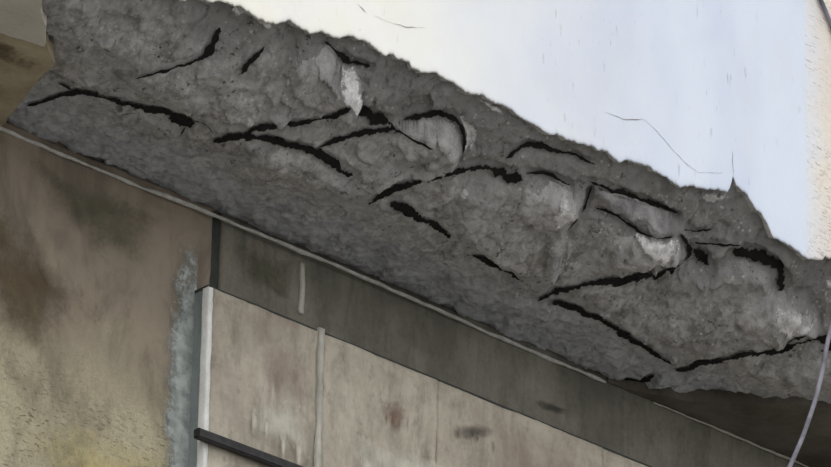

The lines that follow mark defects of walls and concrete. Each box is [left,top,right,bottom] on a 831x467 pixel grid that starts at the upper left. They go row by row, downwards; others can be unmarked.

crack [137,28,221,79]
crack [27,83,831,388]
spalling [595,191,674,239]
water stain [0,221,62,333]
spalling [817,350,831,404]